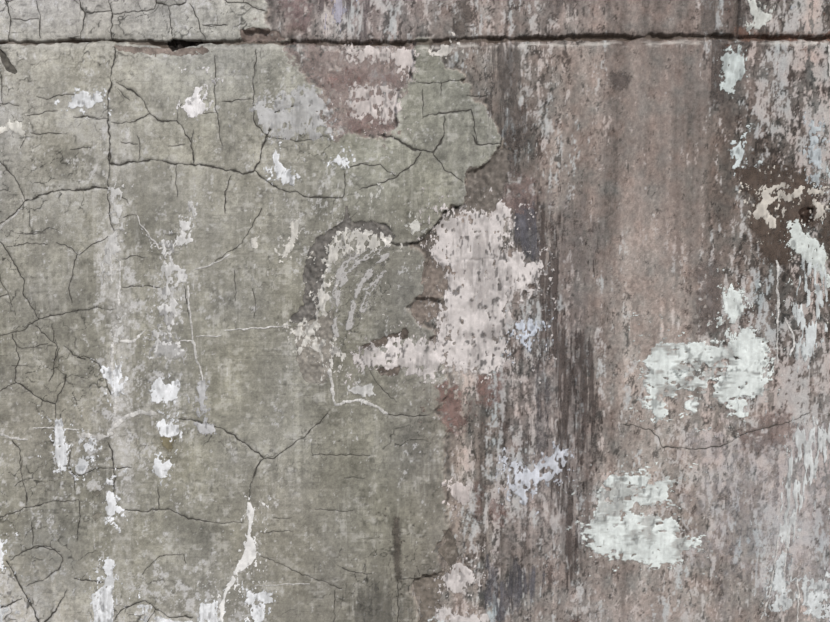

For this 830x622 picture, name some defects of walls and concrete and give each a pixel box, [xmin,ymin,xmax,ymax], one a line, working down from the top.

peeling [249,32,464,186]
crack [0,0,501,414]
peeling [267,146,558,405]
peeling [629,112,830,430]
crack [0,440,130,622]
crack [114,600,192,622]
crack [125,492,242,524]
peeling [129,495,278,622]
crack [179,413,368,498]
peeling [495,441,575,505]
peeling [566,462,714,571]
crack [624,413,809,450]